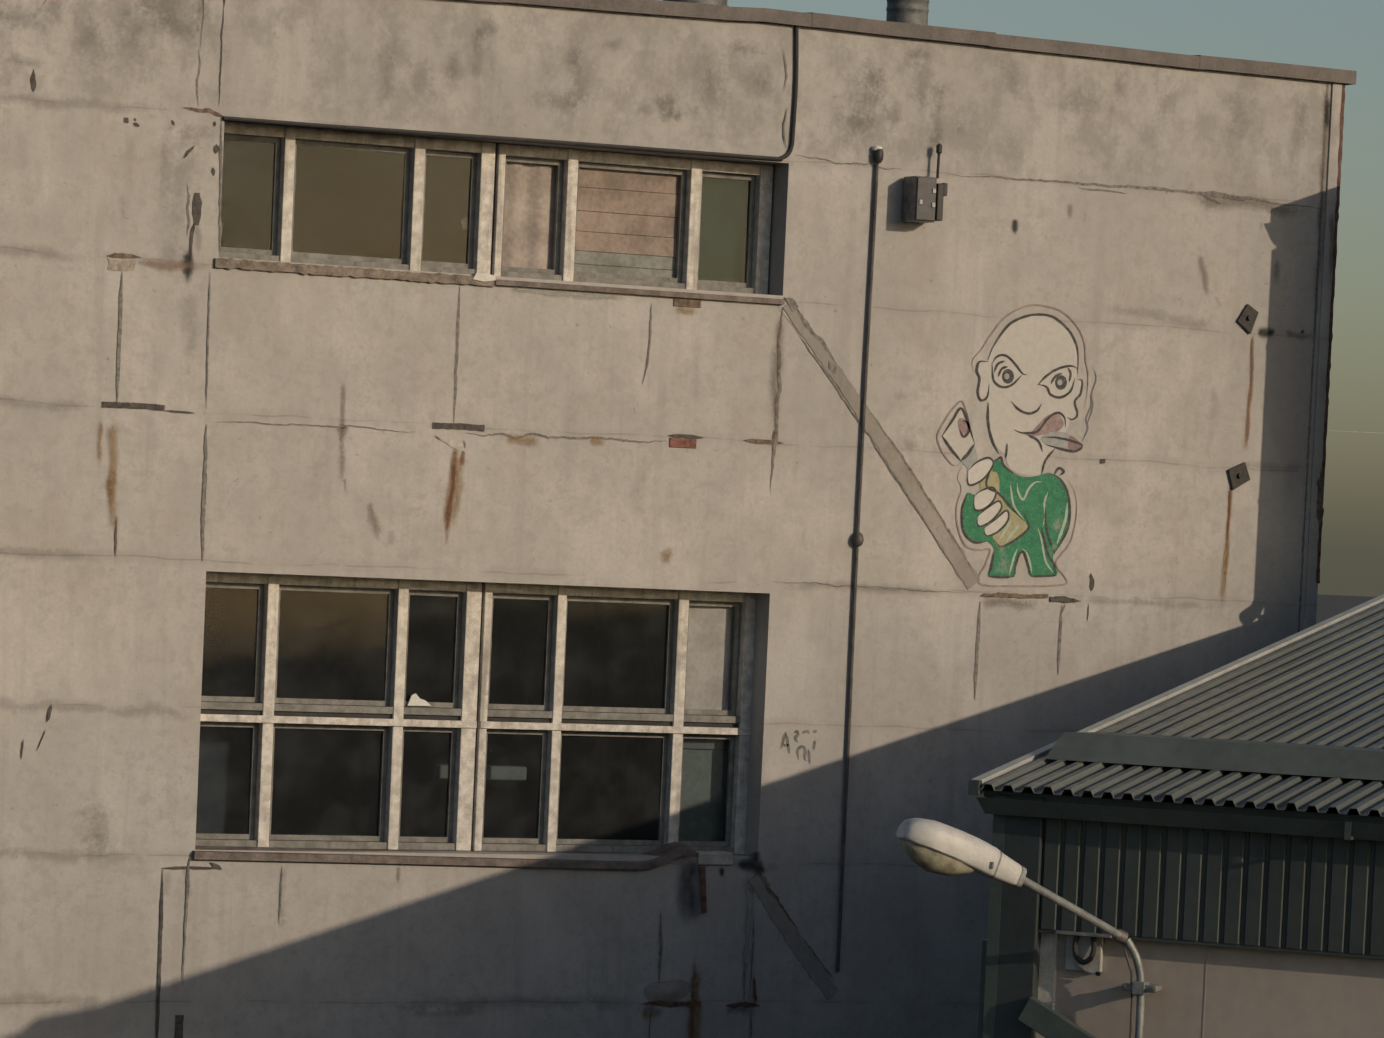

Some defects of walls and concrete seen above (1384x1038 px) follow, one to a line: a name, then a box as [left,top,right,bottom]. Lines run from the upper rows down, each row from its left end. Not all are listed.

rust [1245,339,1253,442]
rust [99,424,116,510]
rust [445,450,465,529]
rust [1222,490,1232,594]